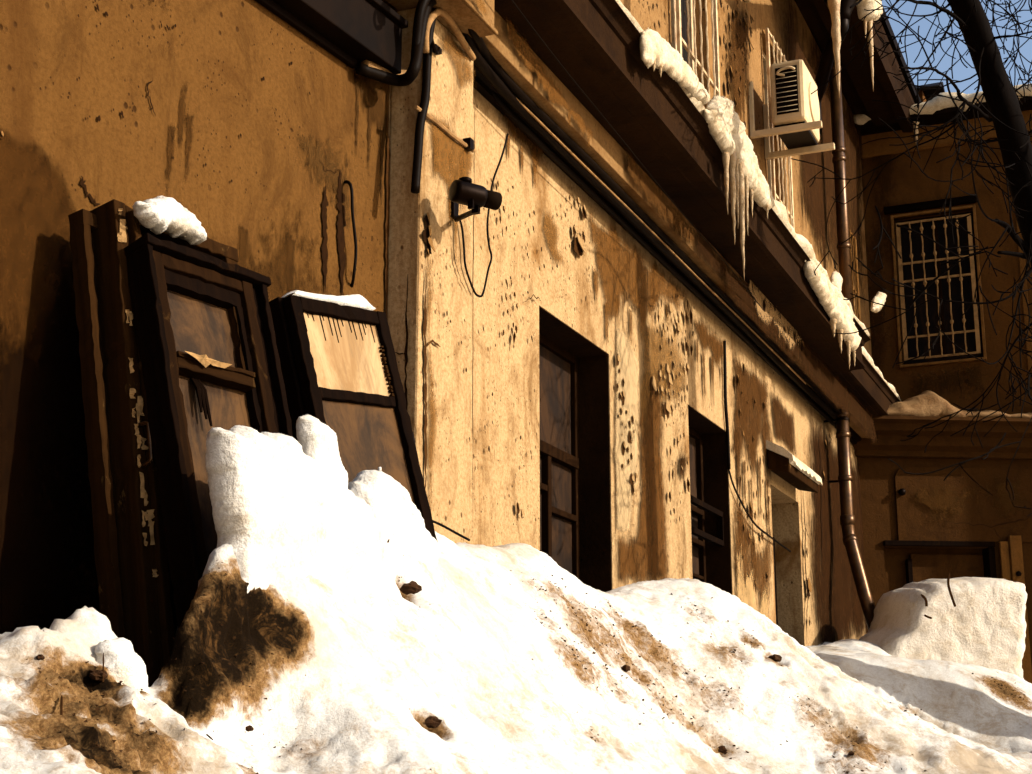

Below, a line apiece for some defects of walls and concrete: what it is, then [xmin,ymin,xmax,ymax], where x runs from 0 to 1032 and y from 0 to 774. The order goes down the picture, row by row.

water stain [166,86,193,180]
water stain [301,73,385,227]
peeling [615,329,639,531]
peeling [651,293,694,427]
peeling [669,432,690,521]
water stain [590,214,797,615]